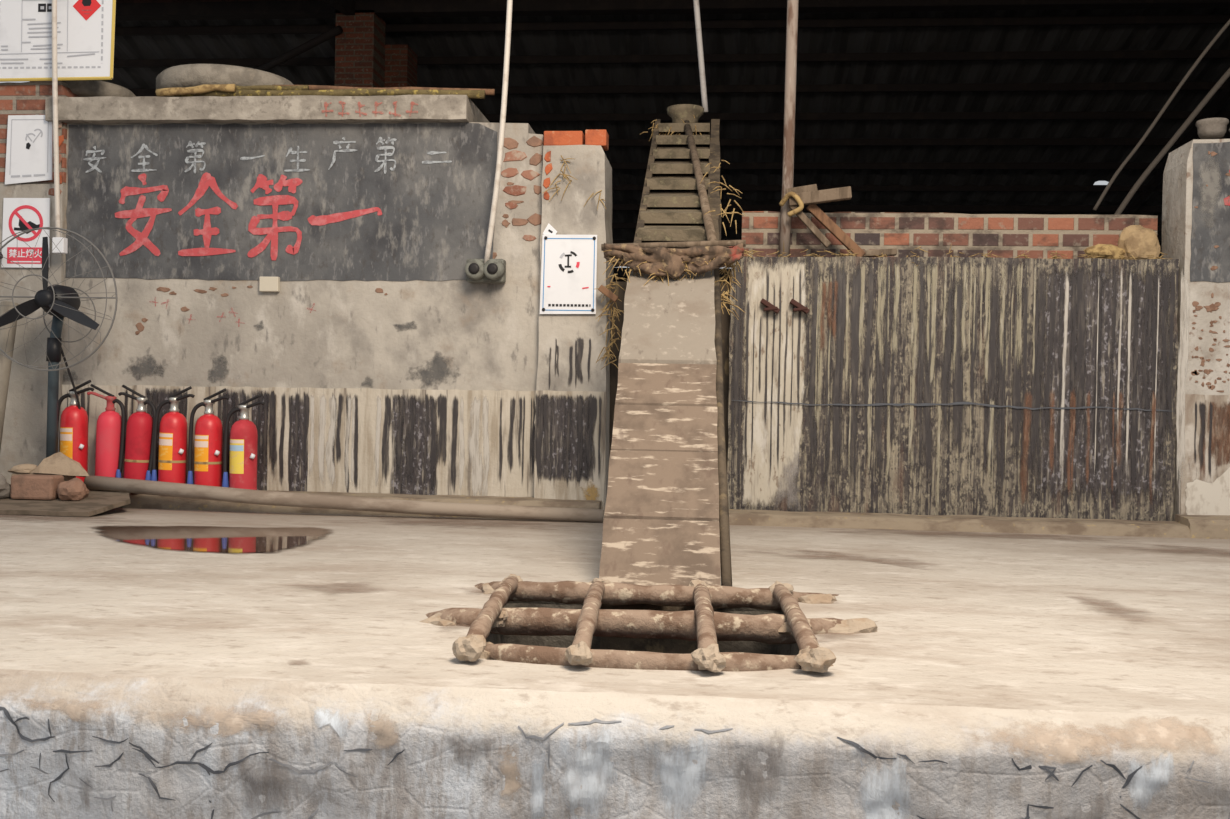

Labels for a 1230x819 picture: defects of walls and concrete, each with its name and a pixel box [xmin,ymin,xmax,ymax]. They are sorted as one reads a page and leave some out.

flaking render [48,122,64,196]
flaking render [501,136,553,241]
spalling [1191,293,1230,392]
leakage [209,338,602,500]
corrosion [1200,403,1230,475]
crack [0,707,404,819]
crack [518,718,622,769]
crack [660,725,733,734]
crack [837,737,948,764]
crack [1012,758,1142,819]